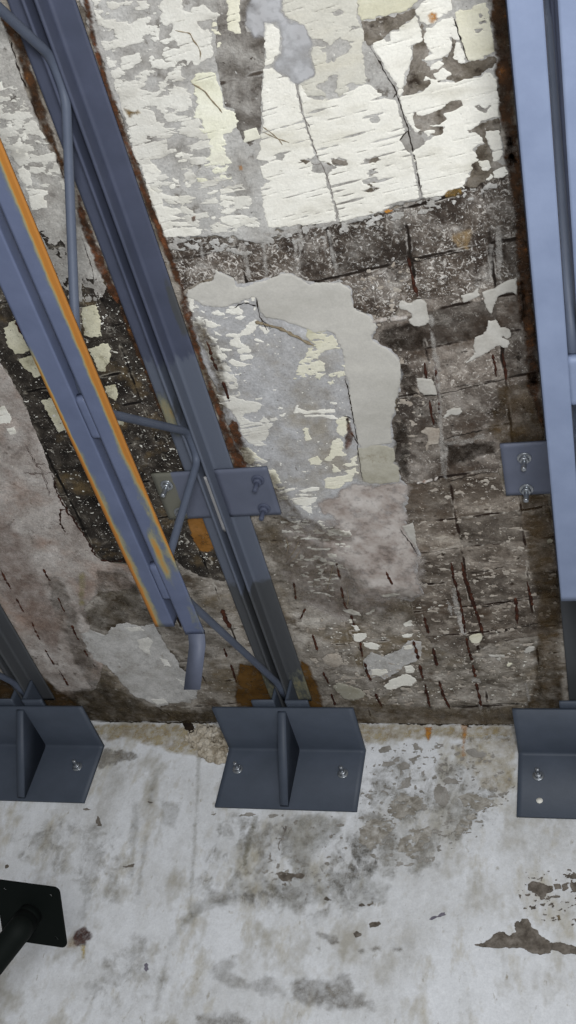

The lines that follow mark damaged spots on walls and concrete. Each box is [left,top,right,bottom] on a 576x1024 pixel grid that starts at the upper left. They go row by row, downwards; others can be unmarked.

rust [78,0,247,468]
crack [295,84,338,213]
crack [370,47,422,196]
rust [489,0,544,443]
spalling [0,287,126,563]
spalling [62,277,226,581]
spalling [91,0,563,709]
rust [345,418,353,448]
rust [235,664,271,707]
damp [331,836,394,887]
spalling [475,869,576,955]
damp [296,982,363,1008]